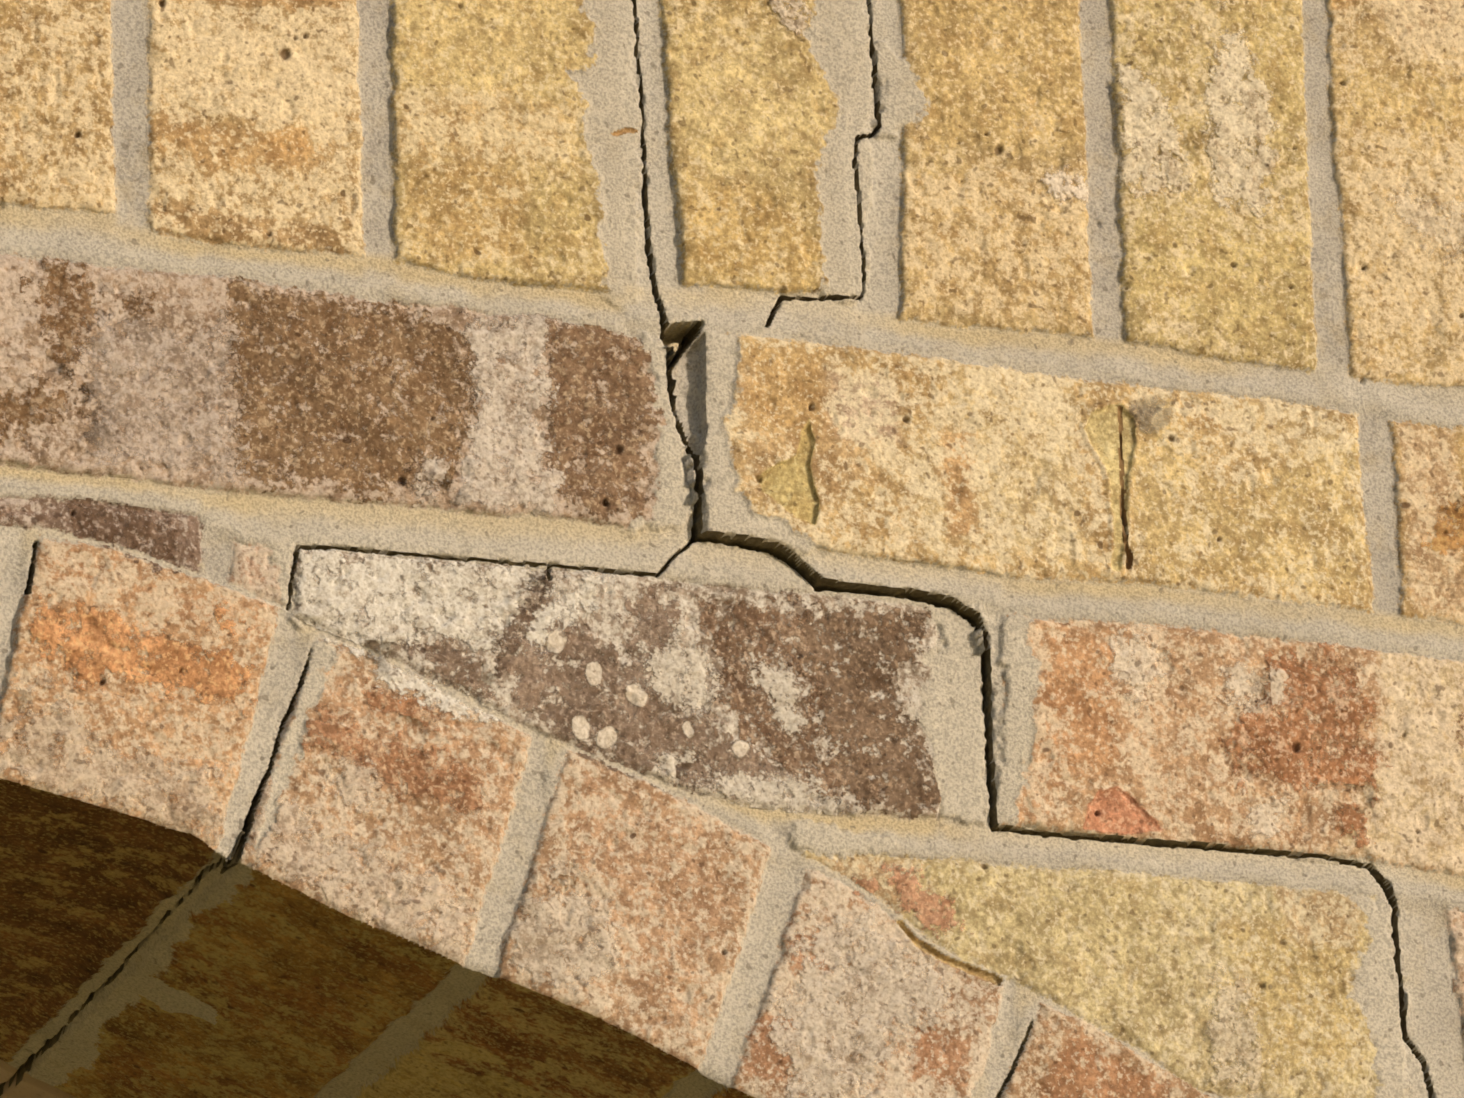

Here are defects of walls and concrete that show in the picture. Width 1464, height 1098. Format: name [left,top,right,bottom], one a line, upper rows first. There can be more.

crack [0,652,311,1096]
crack [286,0,1434,1098]